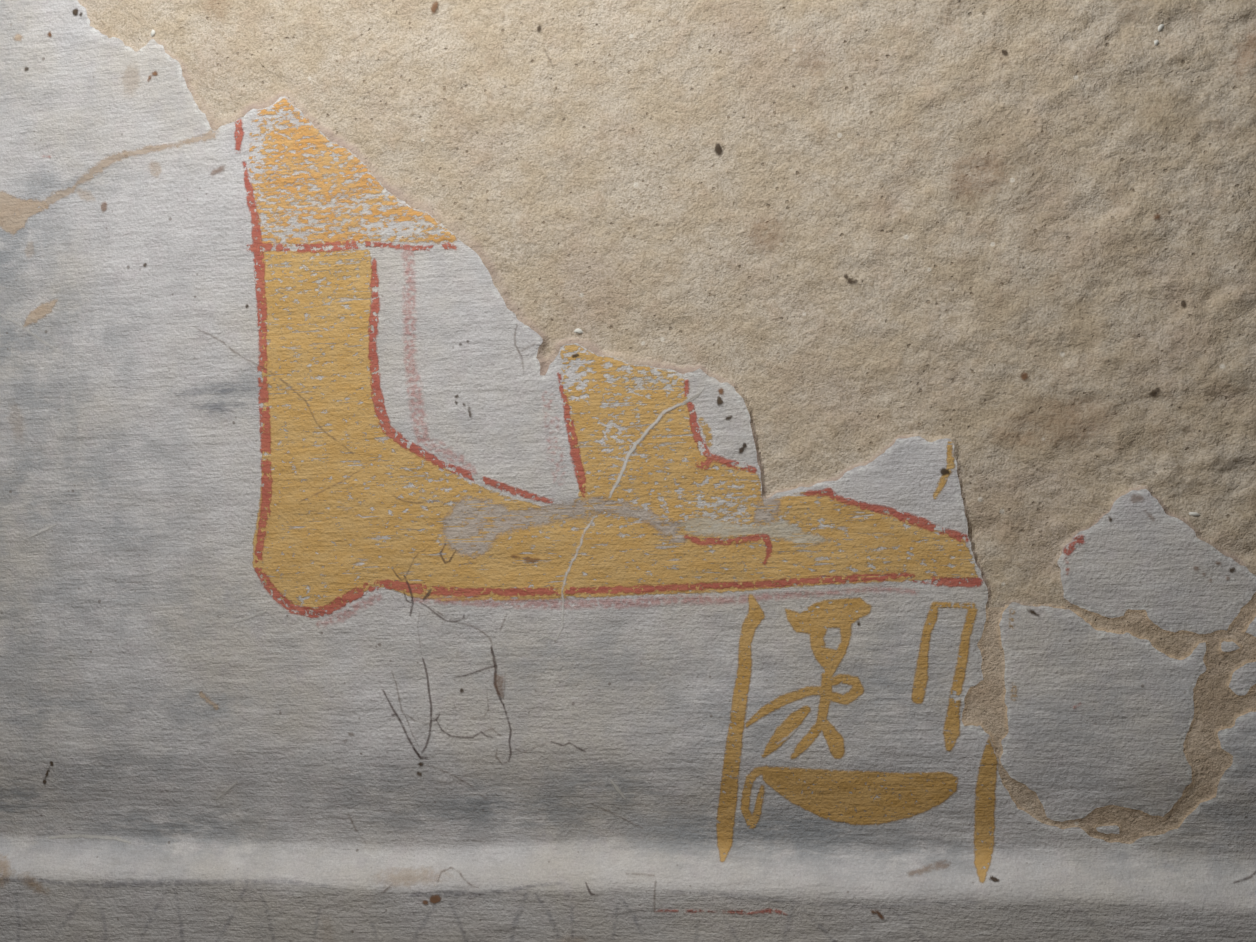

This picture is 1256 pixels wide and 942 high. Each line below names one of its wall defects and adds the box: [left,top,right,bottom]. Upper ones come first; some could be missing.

spalling [78,0,1256,609]
crack [440,387,704,640]
crack [754,499,780,523]
crack [388,664,478,758]
crack [458,650,511,754]